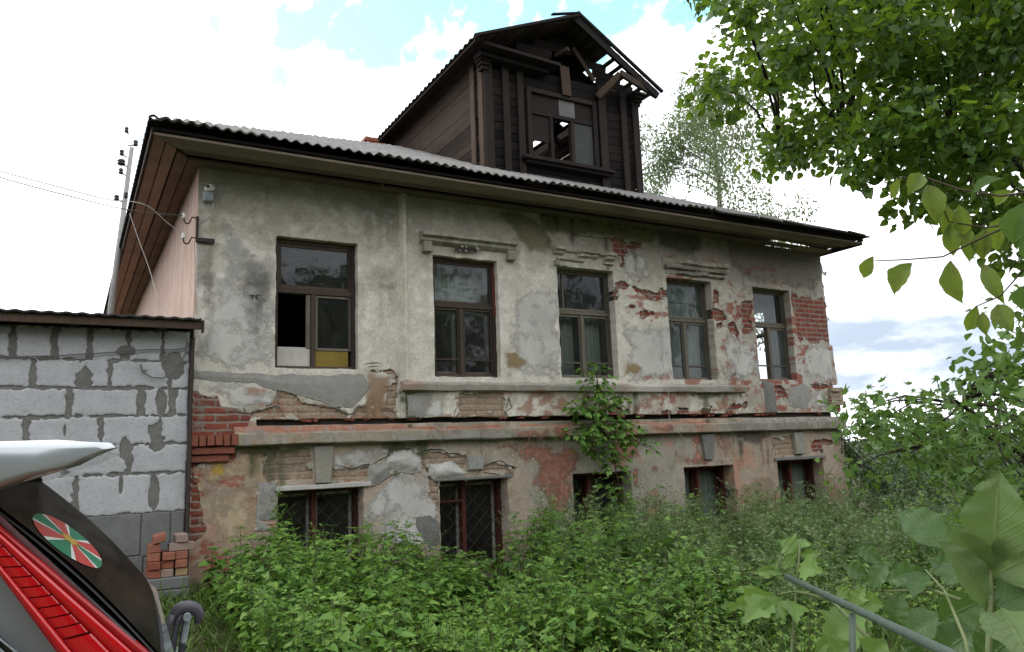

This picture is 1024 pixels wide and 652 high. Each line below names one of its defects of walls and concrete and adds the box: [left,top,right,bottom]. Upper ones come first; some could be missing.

peeling [610,236,673,381]
peeling [711,290,759,378]
spalling [791,291,830,345]
peeling [189,279,578,552]
spalling [656,394,776,465]
spalling [775,385,787,401]
peeling [810,383,833,415]